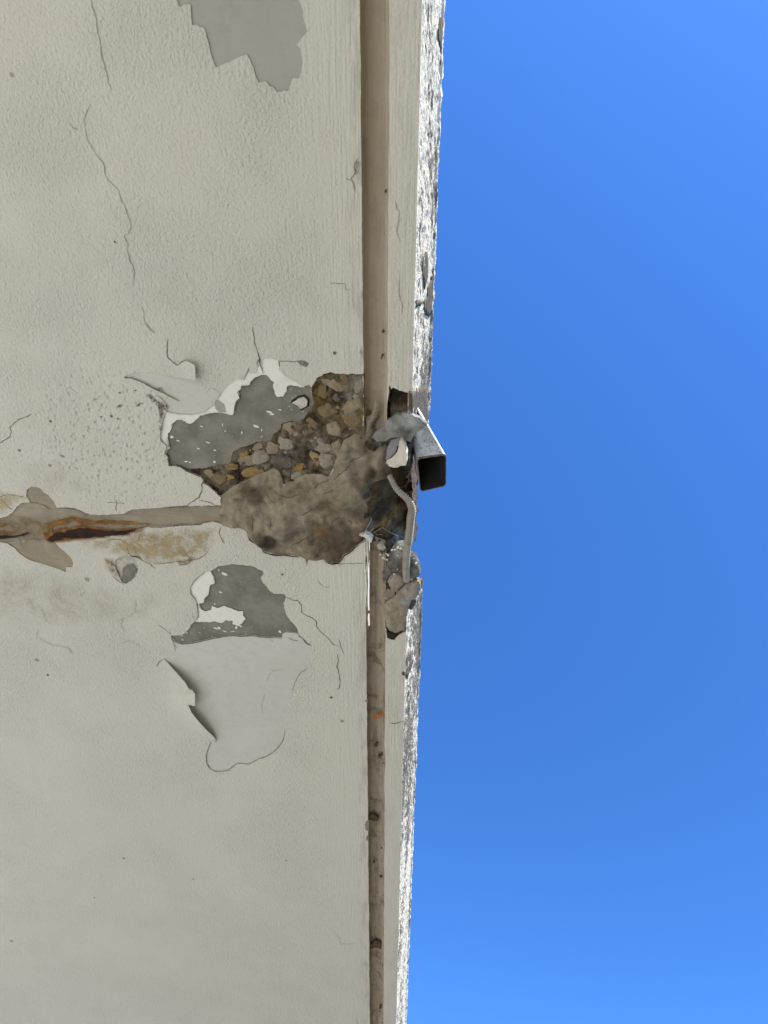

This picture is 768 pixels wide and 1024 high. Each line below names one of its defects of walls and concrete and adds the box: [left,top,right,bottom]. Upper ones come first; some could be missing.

crack [91,0,112,92]
peeling [177,0,307,92]
crack [71,108,135,282]
peeling [387,384,428,422]
spalling [125,358,418,549]
peeling [19,486,57,508]
rust [0,524,29,539]
rust [43,517,149,542]
peeling [9,539,73,572]
spalling [113,556,142,584]
peeling [164,564,313,772]